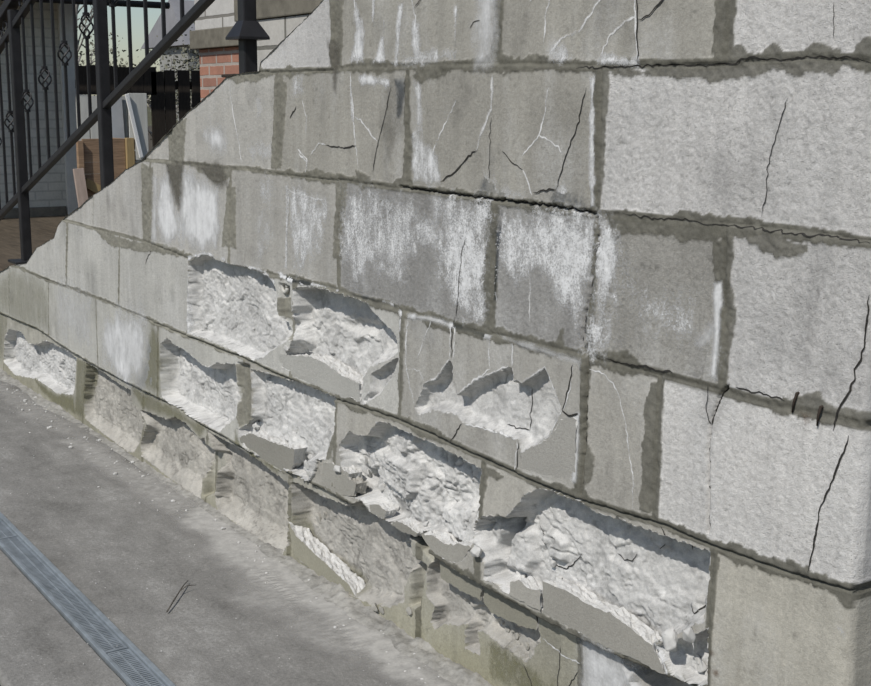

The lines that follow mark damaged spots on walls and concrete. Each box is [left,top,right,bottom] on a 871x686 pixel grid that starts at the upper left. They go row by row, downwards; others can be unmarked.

leakage [152,163,225,261]
leakage [359,74,389,87]
leakage [340,76,623,360]
crack [408,78,598,214]
crack [530,0,600,55]
crack [576,0,870,69]
crack [623,98,869,243]
spalling [3,255,711,686]
crack [405,240,672,505]
crack [706,387,784,462]
crack [808,297,869,569]